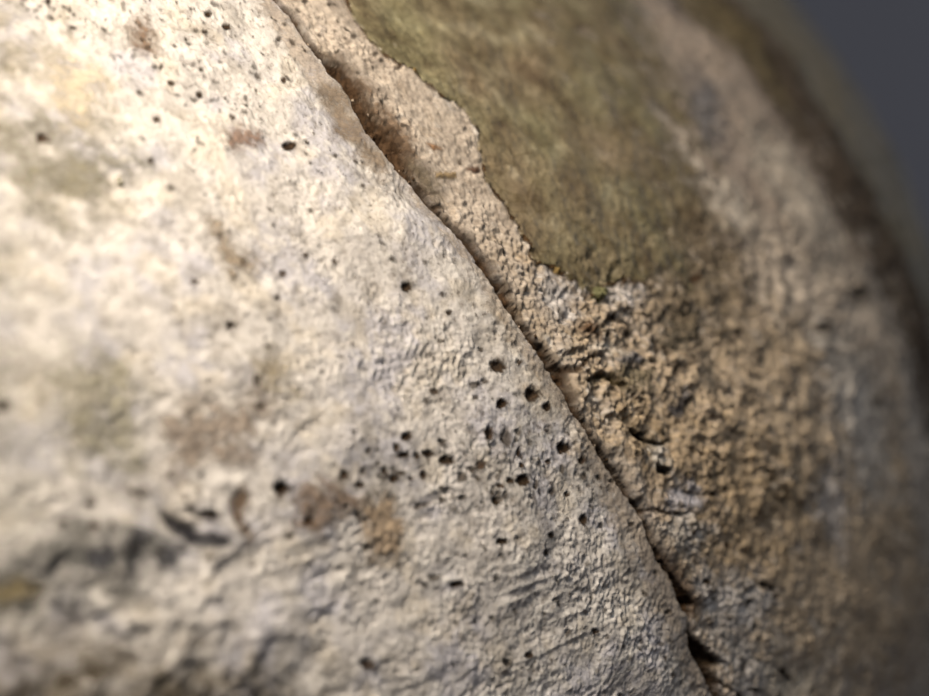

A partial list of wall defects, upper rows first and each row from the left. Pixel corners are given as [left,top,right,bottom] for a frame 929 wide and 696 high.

peeling [285,0,646,331]
crack [272,0,737,696]
spalling [489,359,506,372]
spalling [588,374,624,387]
spalling [523,386,551,411]
spalling [338,469,364,488]
spalling [376,461,426,483]
spalling [394,431,455,464]
spalling [458,459,486,481]
spalling [484,427,530,505]
spalling [545,442,571,473]
spalling [629,430,664,446]